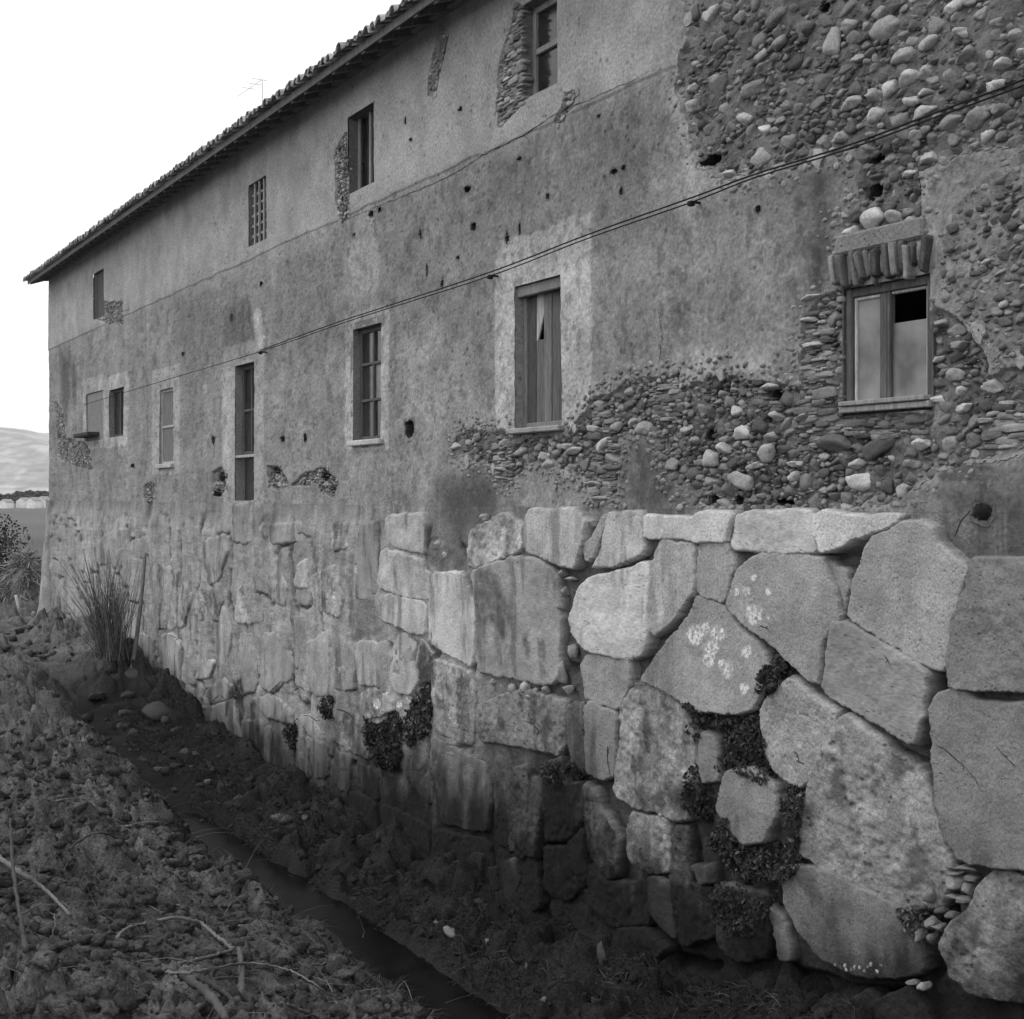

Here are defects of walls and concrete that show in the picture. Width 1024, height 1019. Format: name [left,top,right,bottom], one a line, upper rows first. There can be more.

spalling [425,23,449,98]
spalling [333,132,353,223]
spalling [445,0,1024,513]
spalling [92,296,123,326]
spalling [55,401,93,470]
spalling [212,467,228,497]
spalling [267,465,338,497]